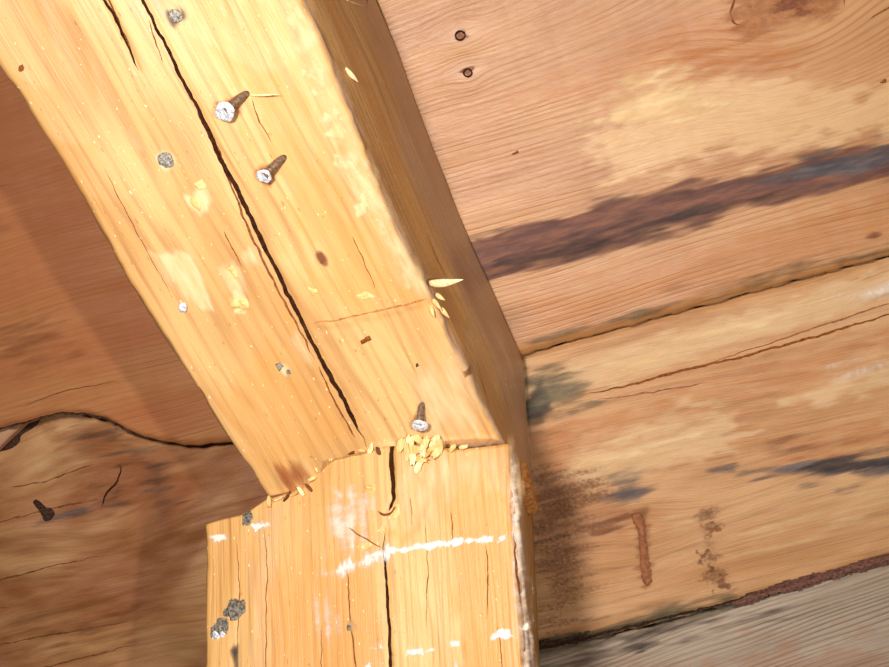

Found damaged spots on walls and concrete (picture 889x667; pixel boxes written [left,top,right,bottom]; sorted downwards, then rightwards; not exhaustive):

crack [103,0,138,69]
crack [141,0,367,447]
water stain [471,144,889,280]
water stain [525,368,586,420]
crack [579,303,889,399]
crack [0,464,122,522]
crack [262,533,270,666]
crack [347,572,356,667]
crack [350,446,429,667]
water stain [591,515,630,535]
water stain [609,488,648,500]
water stain [777,456,889,475]